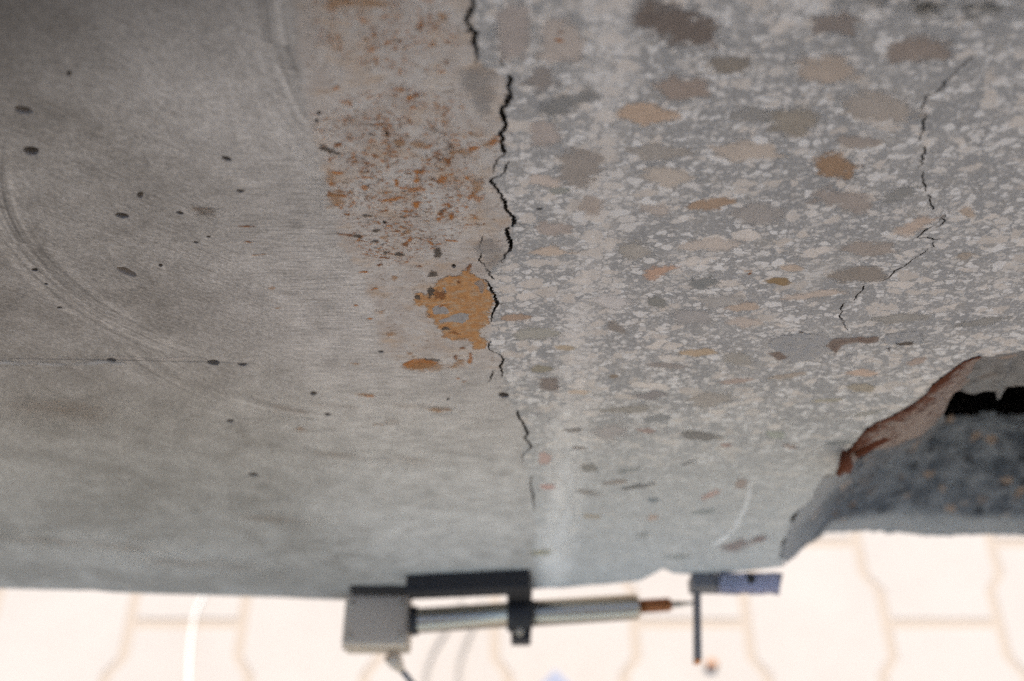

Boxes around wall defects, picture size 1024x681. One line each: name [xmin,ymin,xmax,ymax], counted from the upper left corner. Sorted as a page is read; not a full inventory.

rust [316,86,499,280]
crack [463,0,521,381]
crack [838,57,974,331]
rust [403,353,472,383]
crack [516,411,535,512]
spalling [780,350,1024,565]
rust [836,356,982,477]